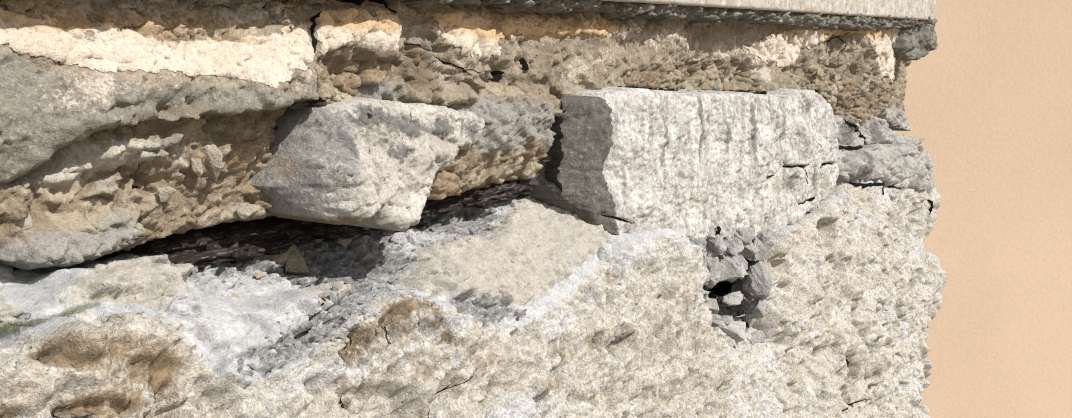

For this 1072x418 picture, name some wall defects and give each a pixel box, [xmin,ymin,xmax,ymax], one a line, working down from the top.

crack [310,0,396,53]
crack [404,43,481,79]
crack [618,86,767,94]
crack [766,35,901,204]
spalling [391,232,407,244]
spalling [699,225,725,266]
spalling [703,279,755,349]
water stain [52,395,136,416]